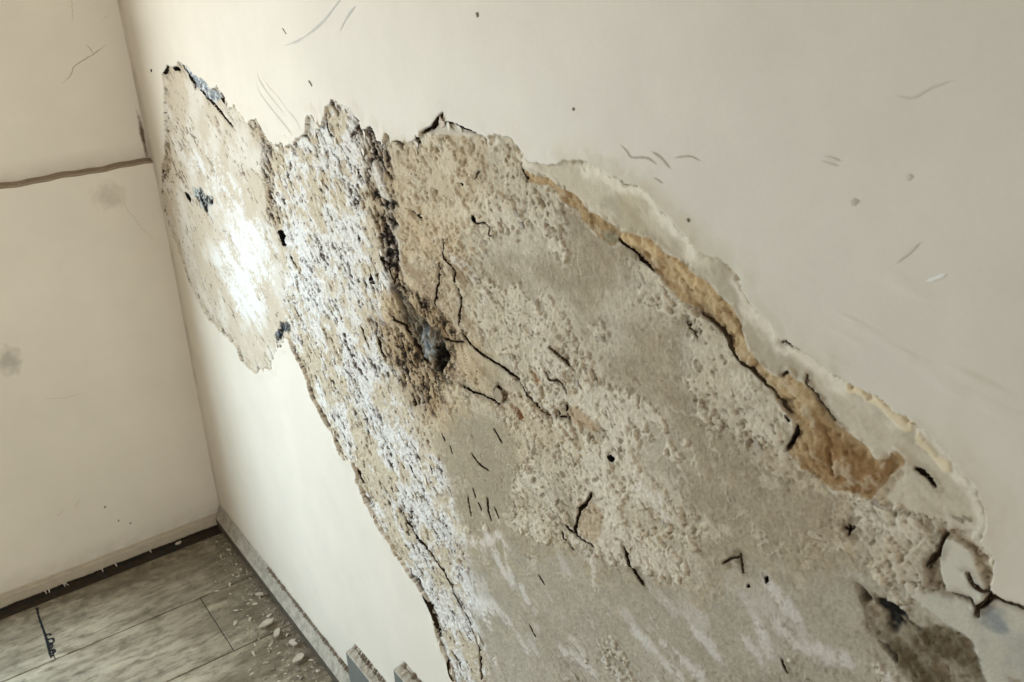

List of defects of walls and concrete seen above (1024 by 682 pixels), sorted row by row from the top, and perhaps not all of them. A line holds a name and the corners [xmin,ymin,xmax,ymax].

crack [361,242,573,420]
peeling [161,63,1024,682]
crack [441,433,500,521]
crack [561,493,594,550]
crack [624,548,644,585]
crack [926,534,948,568]
crack [952,573,1024,617]